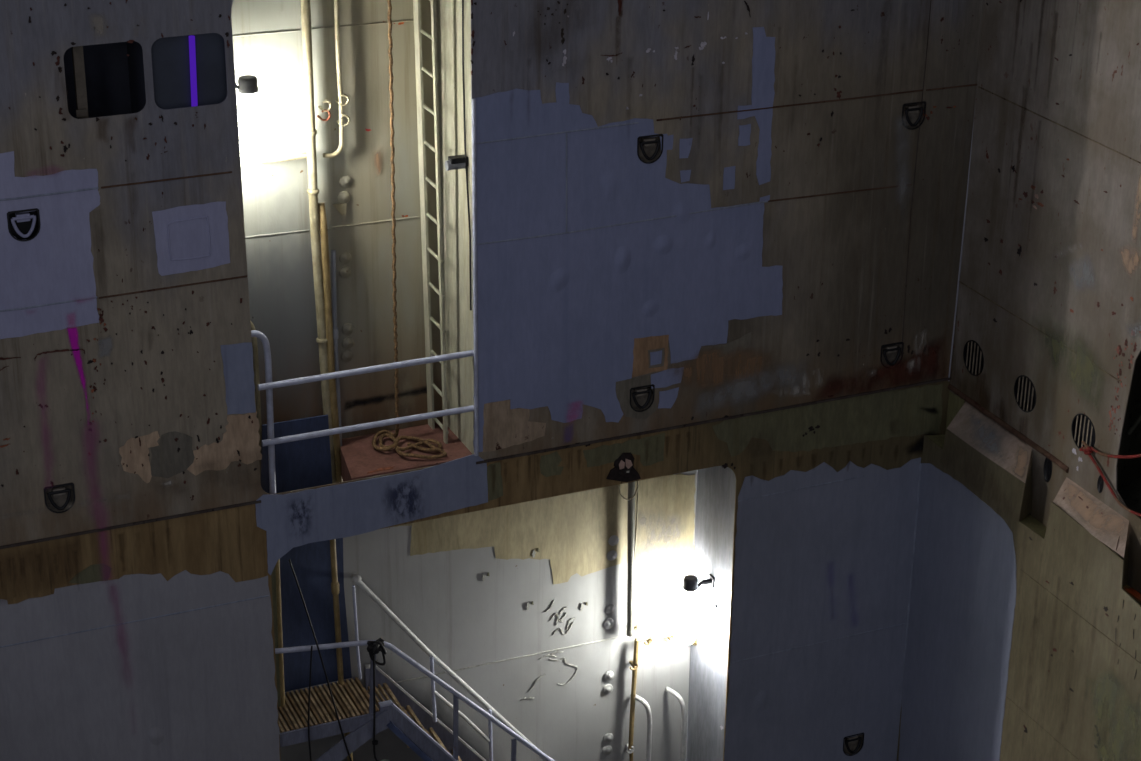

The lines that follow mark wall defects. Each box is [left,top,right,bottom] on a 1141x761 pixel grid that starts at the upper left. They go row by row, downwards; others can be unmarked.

peeling [119,431,160,483]
peeling [187,412,262,476]